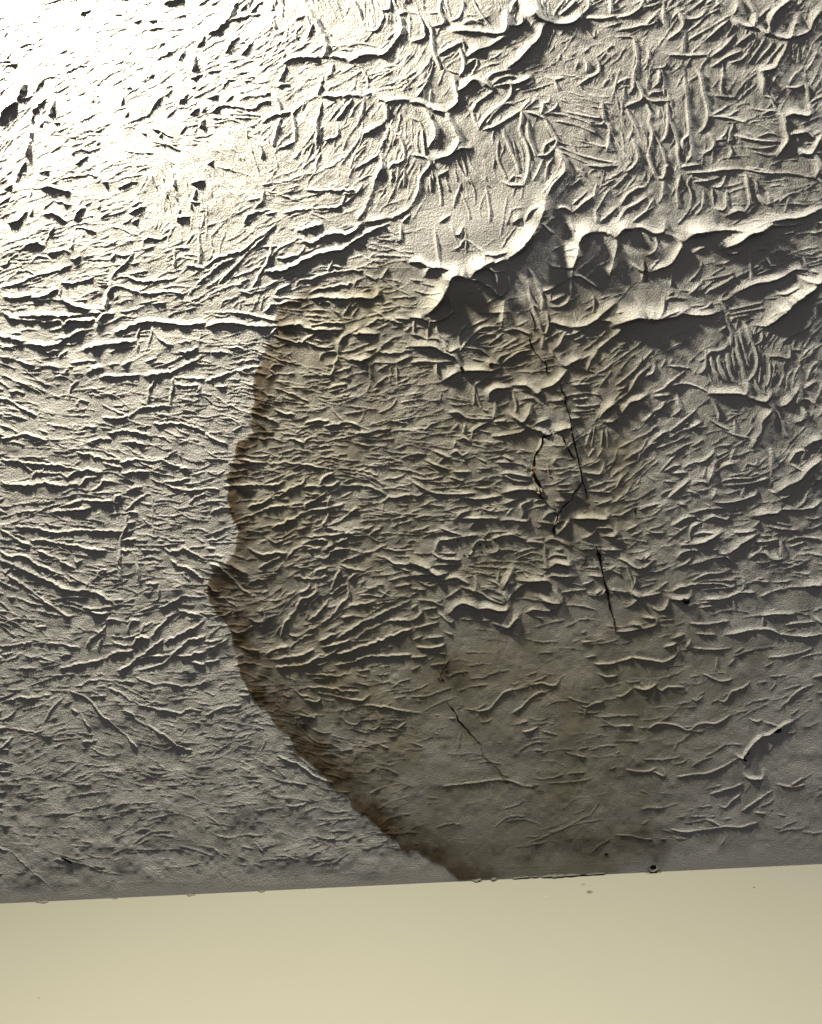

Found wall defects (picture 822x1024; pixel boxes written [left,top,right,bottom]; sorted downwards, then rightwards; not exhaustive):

leakage [227,358,270,543]
crack [514,310,617,632]
leakage [207,560,473,879]
crack [447,702,544,792]